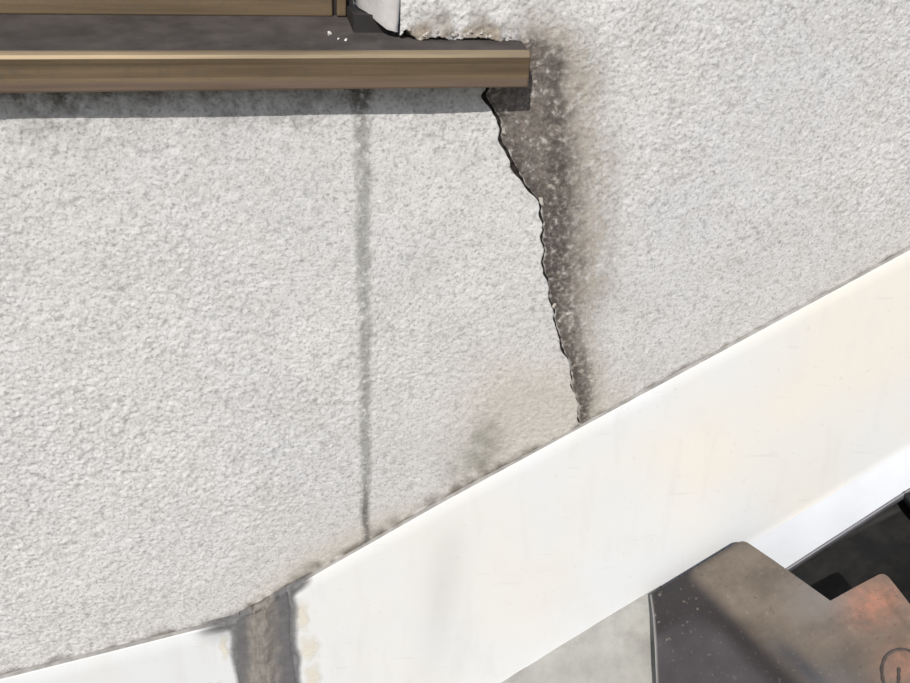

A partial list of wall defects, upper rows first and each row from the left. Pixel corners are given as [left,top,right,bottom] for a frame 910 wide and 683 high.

damp [351,89,369,270]
crack [481,87,580,422]
damp [489,26,603,417]
damp [359,285,370,542]
damp [209,611,249,683]
damp [270,575,307,683]